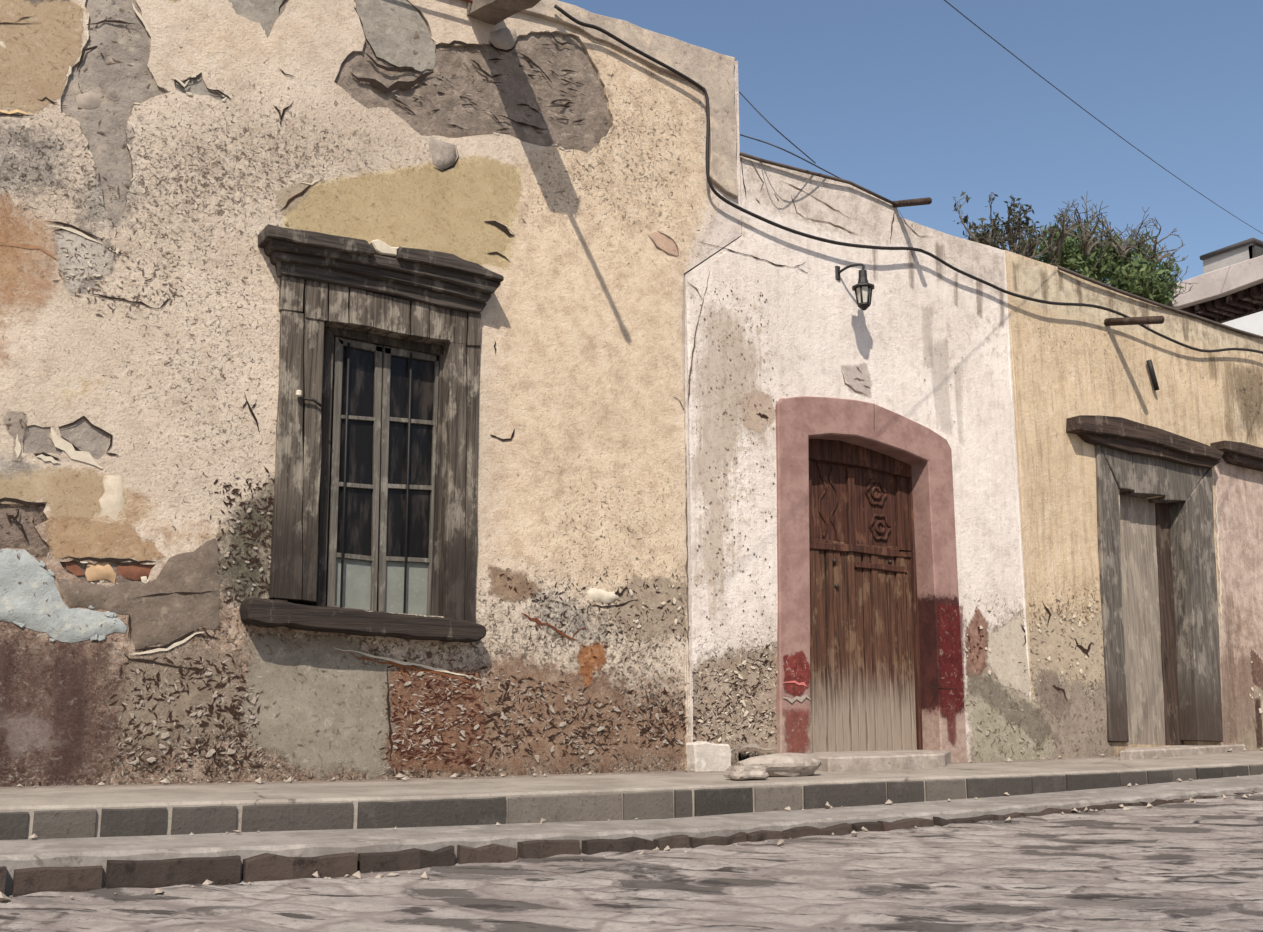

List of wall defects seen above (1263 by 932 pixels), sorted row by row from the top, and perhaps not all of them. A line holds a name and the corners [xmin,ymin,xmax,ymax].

flaking render [229,0,287,38]
flaking render [334,0,615,153]
flaking render [378,280,811,775]